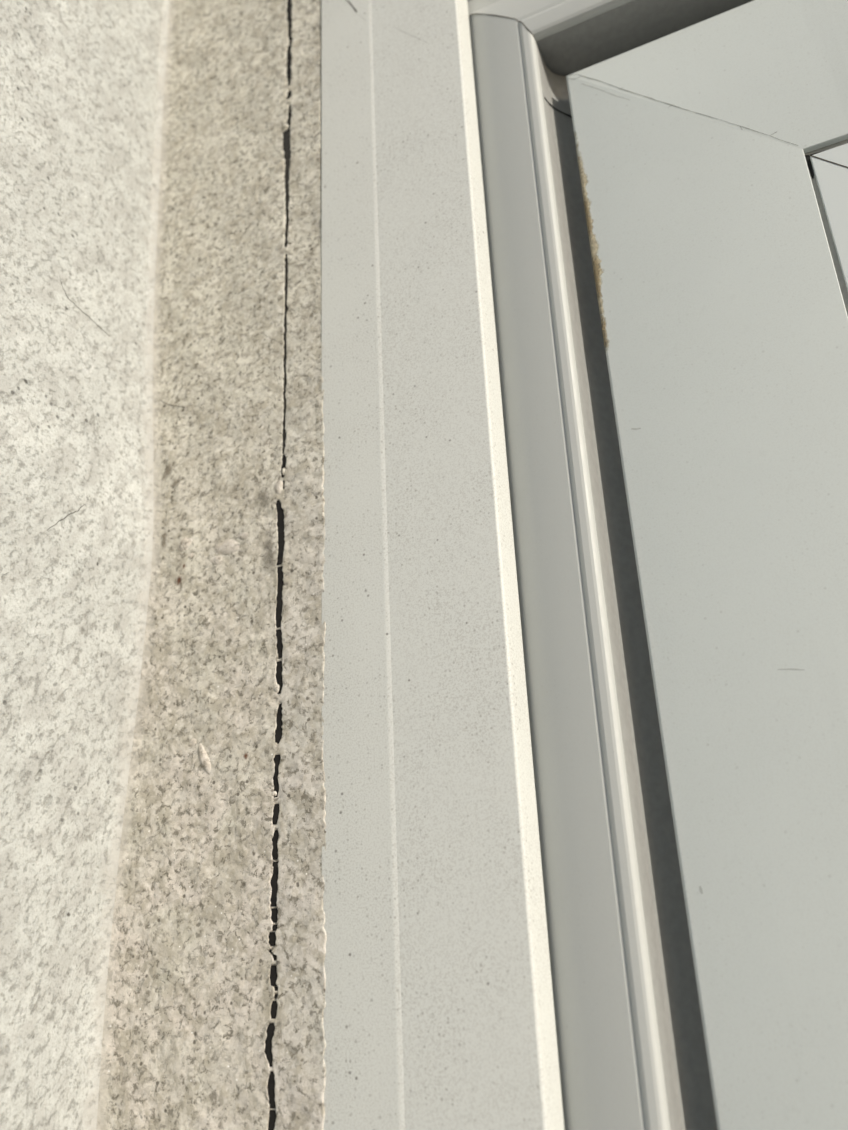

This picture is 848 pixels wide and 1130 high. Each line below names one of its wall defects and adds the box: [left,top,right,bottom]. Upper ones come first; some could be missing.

crack [264,0,293,1130]